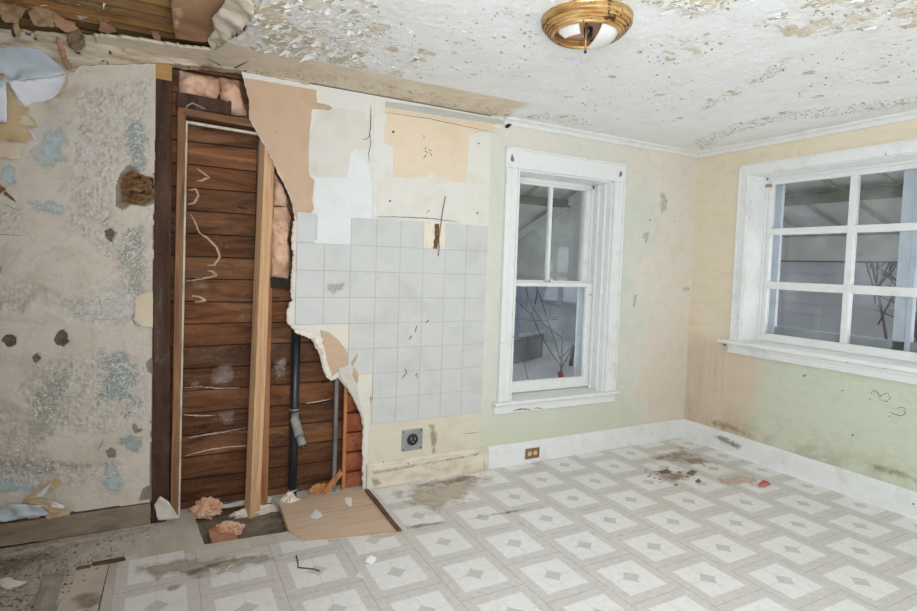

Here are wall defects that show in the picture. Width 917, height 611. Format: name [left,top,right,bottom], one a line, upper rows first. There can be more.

peeling [0,2,117,69]
peeling [207,0,538,117]
peeling [524,32,917,150]
peeling [755,0,917,37]
flaking render [116,165,155,210]
flaking render [133,292,153,328]